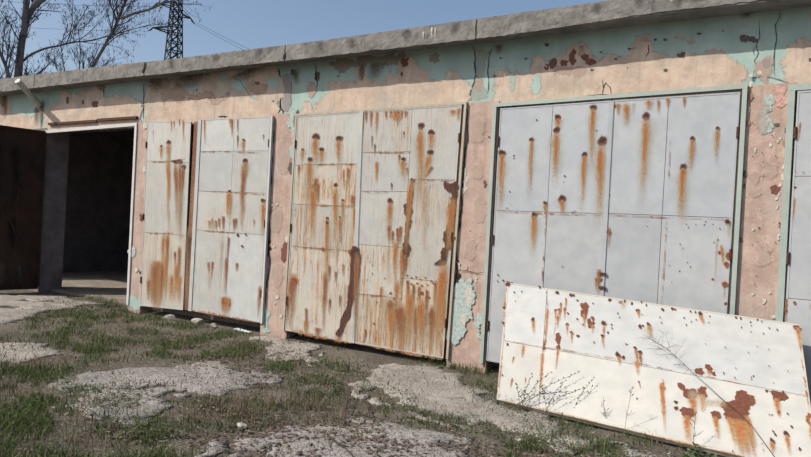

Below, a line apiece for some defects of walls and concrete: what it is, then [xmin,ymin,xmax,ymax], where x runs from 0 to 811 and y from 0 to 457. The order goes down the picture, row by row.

peeling [0,66,285,134]
corrosion [147,140,195,300]
corrosion [207,119,265,284]
corrosion [292,110,459,360]
peeling [286,55,483,174]
crack [458,25,492,233]
peeling [491,32,811,147]
crack [751,13,788,83]
spalling [770,164,784,209]
peeling [446,256,482,345]
corrosion [535,256,612,388]
corrosion [638,364,793,457]